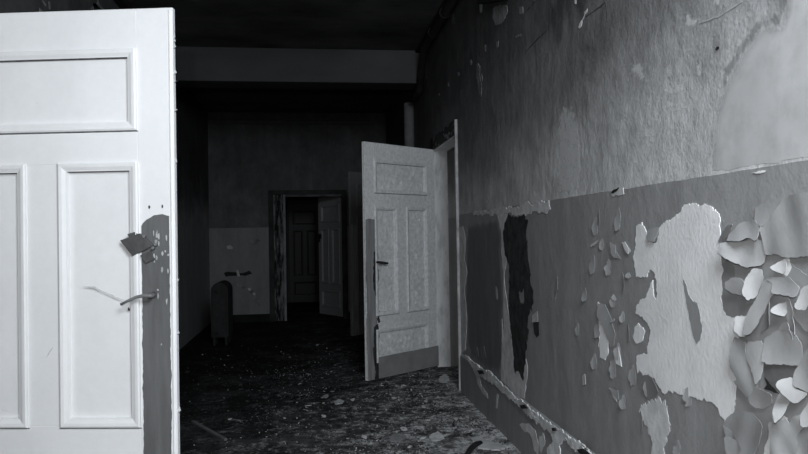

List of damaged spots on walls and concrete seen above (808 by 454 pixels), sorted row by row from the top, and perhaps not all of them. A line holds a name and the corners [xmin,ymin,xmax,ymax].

leakage [714,0,808,171]
flaking render [459,200,594,454]
peeling [582,192,808,454]